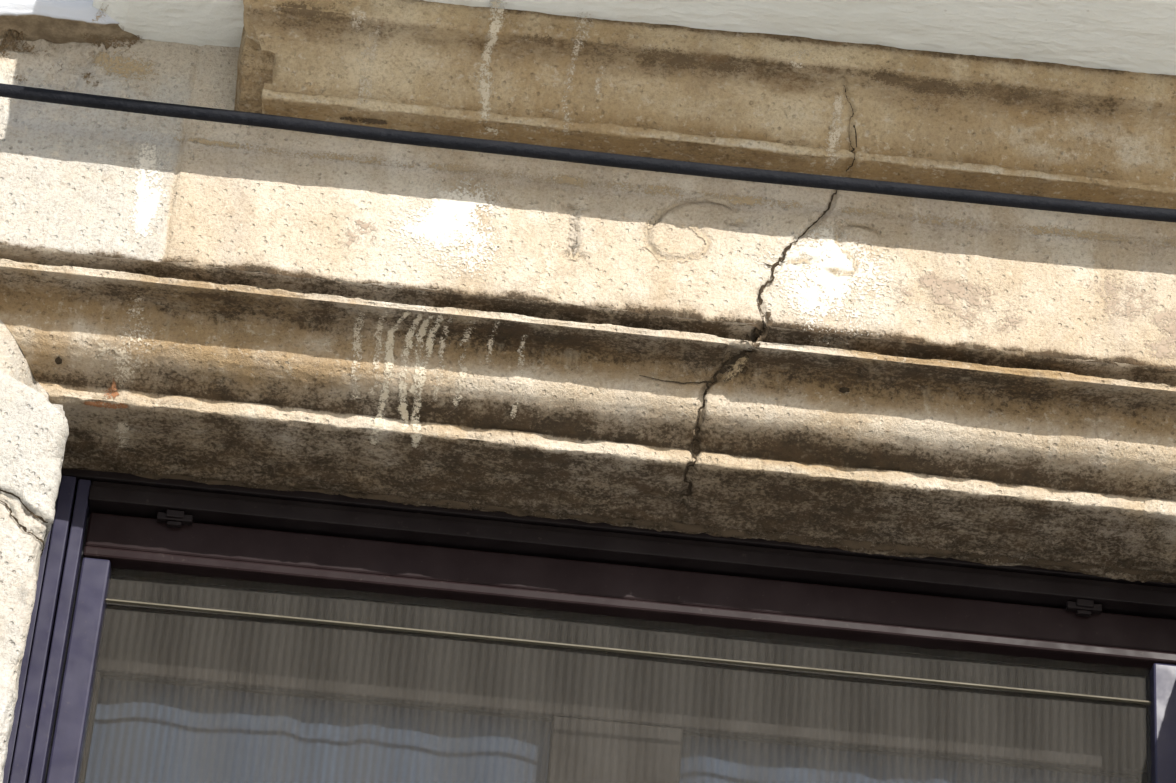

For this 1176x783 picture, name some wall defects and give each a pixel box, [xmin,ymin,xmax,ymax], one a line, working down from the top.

damp [276,0,387,125]
damp [473,0,507,137]
damp [618,45,747,74]
damp [868,65,1043,101]
crack [639,85,857,497]
damp [350,310,476,448]
damp [510,335,528,419]
crack [0,489,48,557]